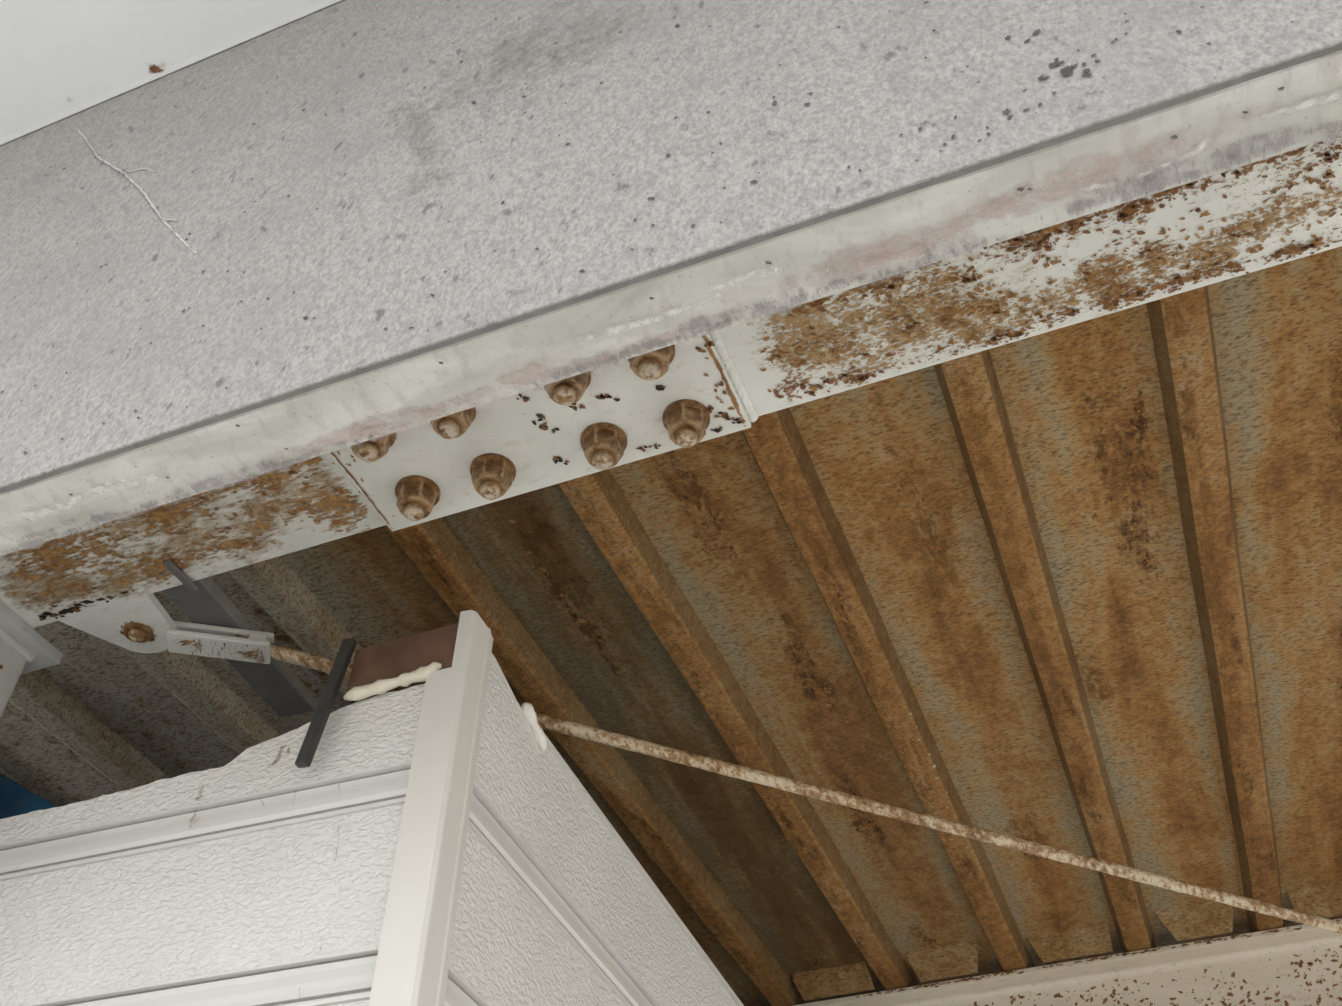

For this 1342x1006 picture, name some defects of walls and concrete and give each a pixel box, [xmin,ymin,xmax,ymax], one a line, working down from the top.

rust [747,137,1342,400]
rust [0,450,456,610]
rust [1086,385,1175,583]
rust [1182,388,1273,865]
rust [856,925,1308,998]
rust [1009,945,1342,1006]